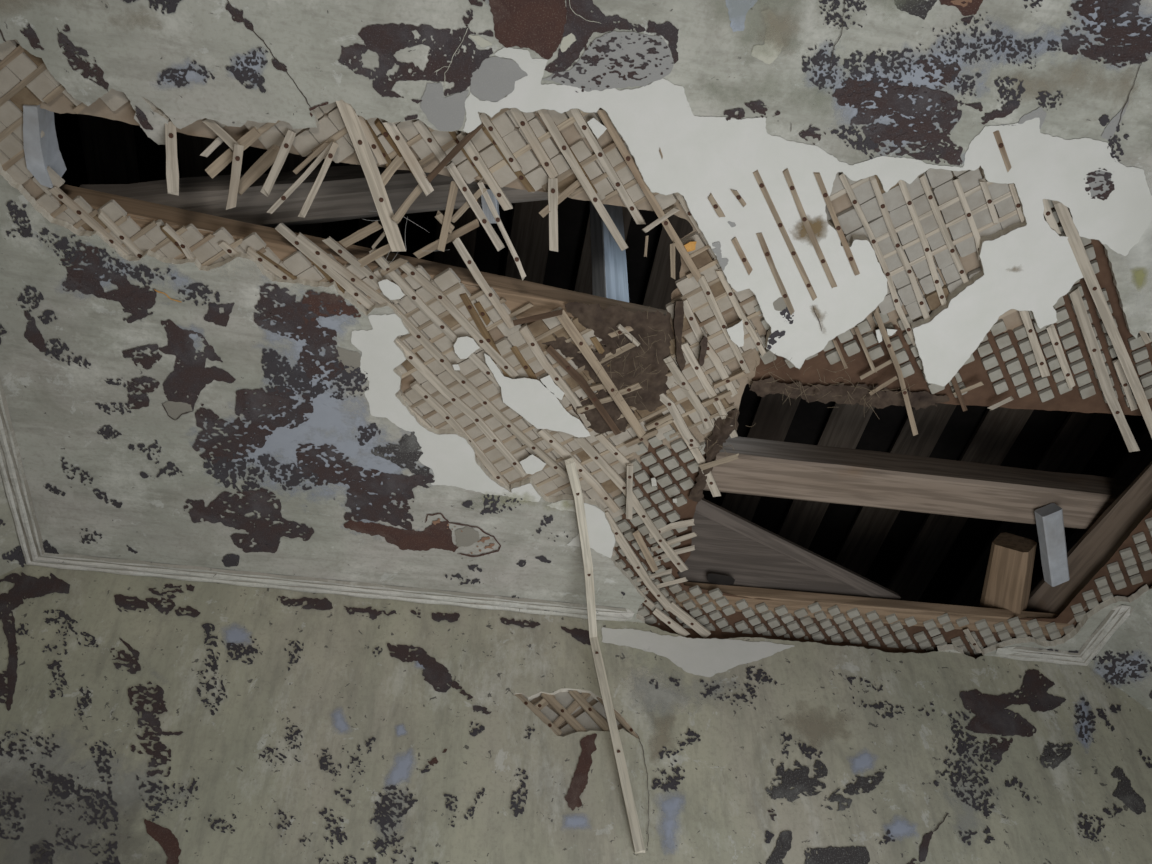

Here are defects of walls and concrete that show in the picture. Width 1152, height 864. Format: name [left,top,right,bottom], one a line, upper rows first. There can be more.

peeling [157,47,268,93]
crack [226,0,328,117]
flaking render [338,0,1152,386]
peeling [6,201,615,585]
peeling [0,546,70,711]
peeling [0,729,121,864]
peeling [42,609,199,864]
peeling [277,596,397,620]
peeling [411,610,460,623]
peeling [934,669,1121,846]
peeling [1078,766,1146,842]
peeling [1092,651,1152,689]